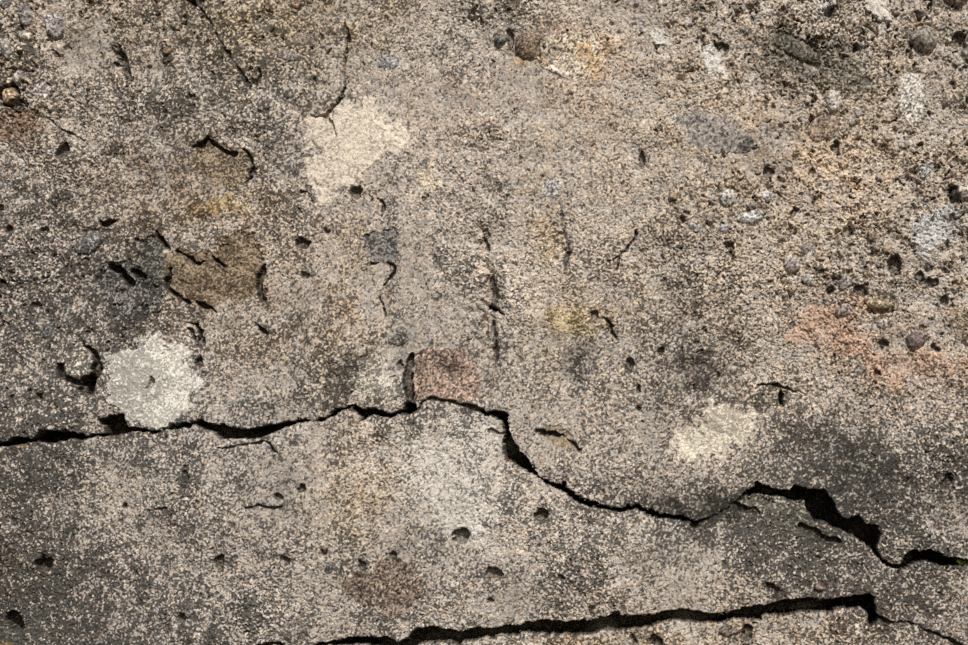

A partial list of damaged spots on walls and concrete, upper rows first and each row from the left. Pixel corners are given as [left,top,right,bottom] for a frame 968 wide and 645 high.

crack [603,317,619,341]
crack [58,339,104,395]
crack [757,383,796,403]
crack [0,353,693,522]
crack [718,482,968,568]
crack [261,637,284,645]
crack [316,593,963,645]